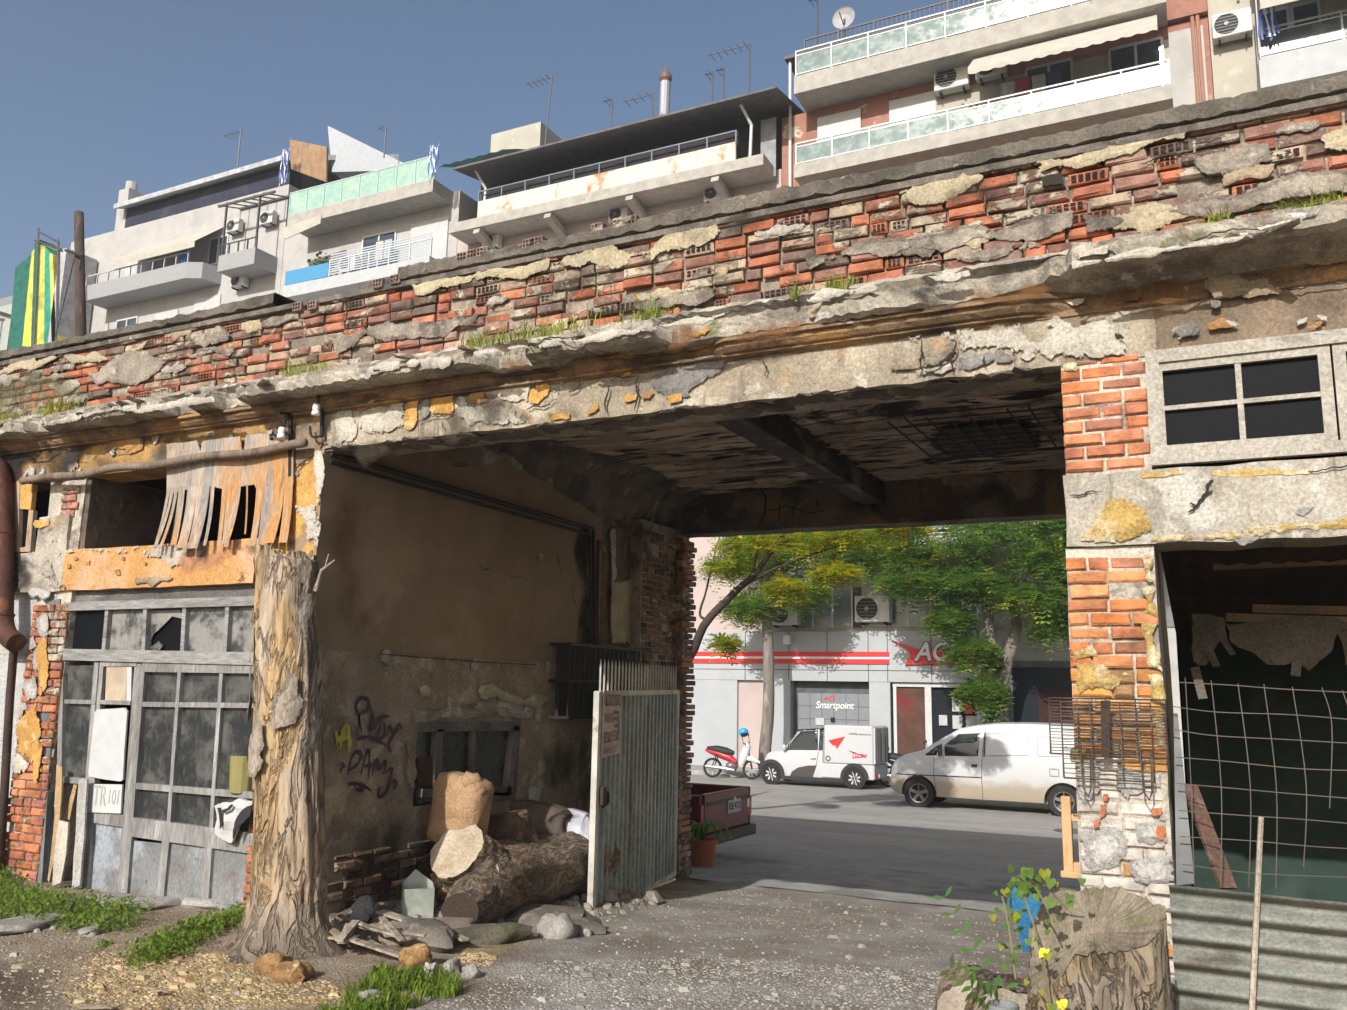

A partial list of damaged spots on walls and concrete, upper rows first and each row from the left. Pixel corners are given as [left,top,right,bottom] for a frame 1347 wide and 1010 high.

peeling [1037,129,1185,186]
peeling [804,142,1347,270]
peeling [412,219,718,296]
peeling [0,326,234,434]
damp [481,400,503,422]
peeling [332,312,728,375]
peeling [795,284,878,318]
peeling [902,297,1129,376]
peeling [267,375,570,547]
crack [1188,479,1213,513]
peeling [12,541,207,782]
peeling [1080,497,1347,750]